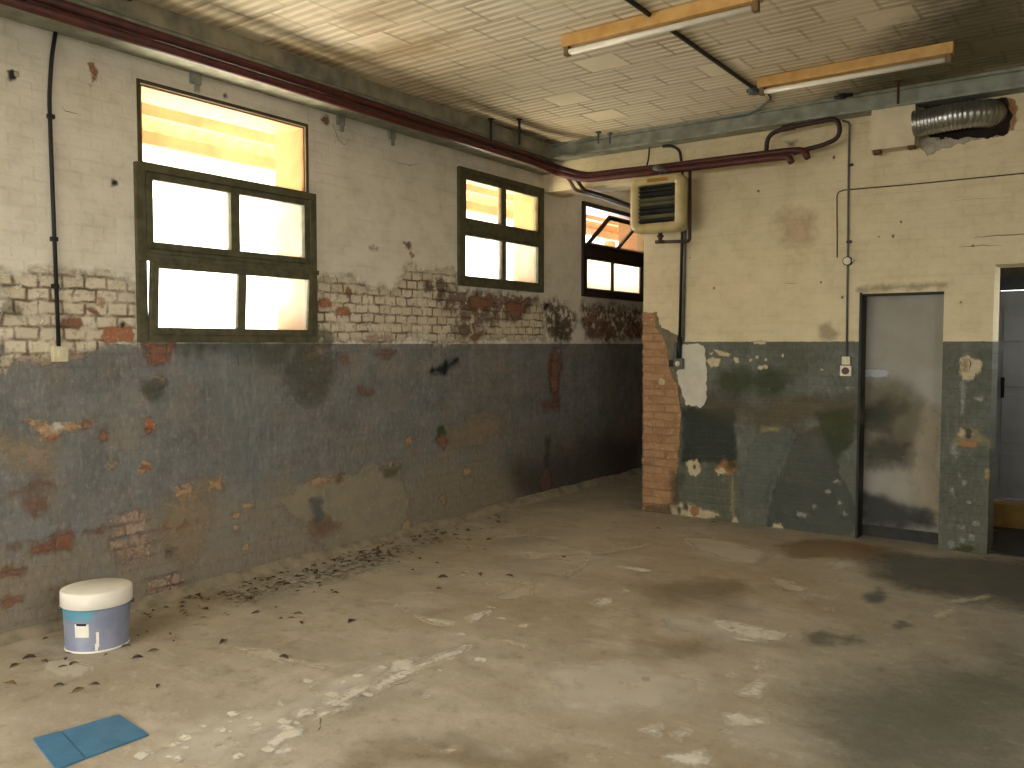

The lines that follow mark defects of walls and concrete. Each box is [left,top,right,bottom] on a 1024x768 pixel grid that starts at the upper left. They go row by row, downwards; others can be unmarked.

spalling [918,97,1017,155]
peeling [0,269,176,374]
peeling [317,242,739,523]
flaking render [959,355,983,382]
peeling [28,420,107,444]
damp [682,369,928,466]
flaking render [952,428,988,448]
peeling [31,509,154,564]